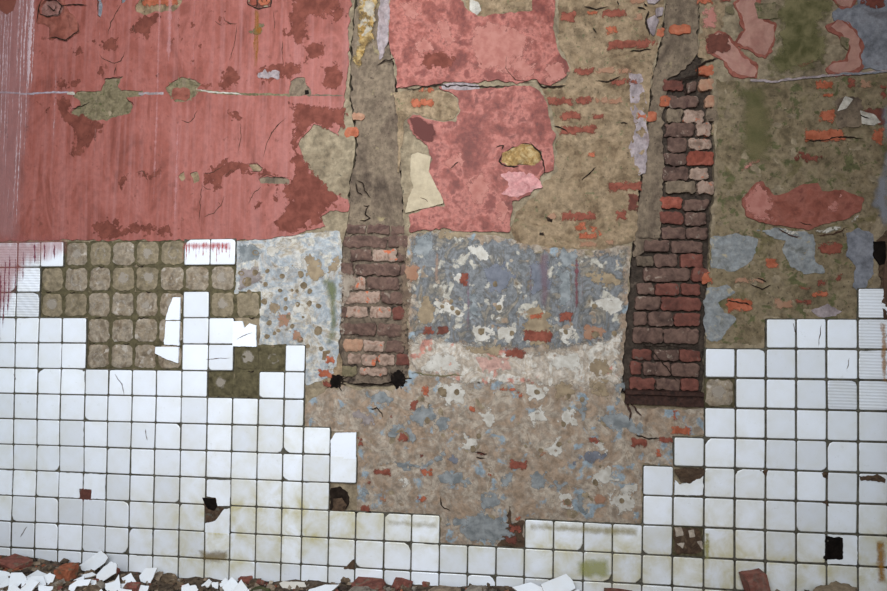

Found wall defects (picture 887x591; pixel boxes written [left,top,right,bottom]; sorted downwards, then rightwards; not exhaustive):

spalling [129,0,182,48]
water stain [2,0,34,113]
spalling [166,66,240,102]
crack [398,58,565,90]
spalling [46,66,143,157]
spalling [179,0,887,517]
peeling [41,217,306,398]
spalling [59,472,106,502]
spalling [202,479,231,533]
peeling [440,437,638,547]
peeling [672,526,703,557]
spalling [823,534,858,565]